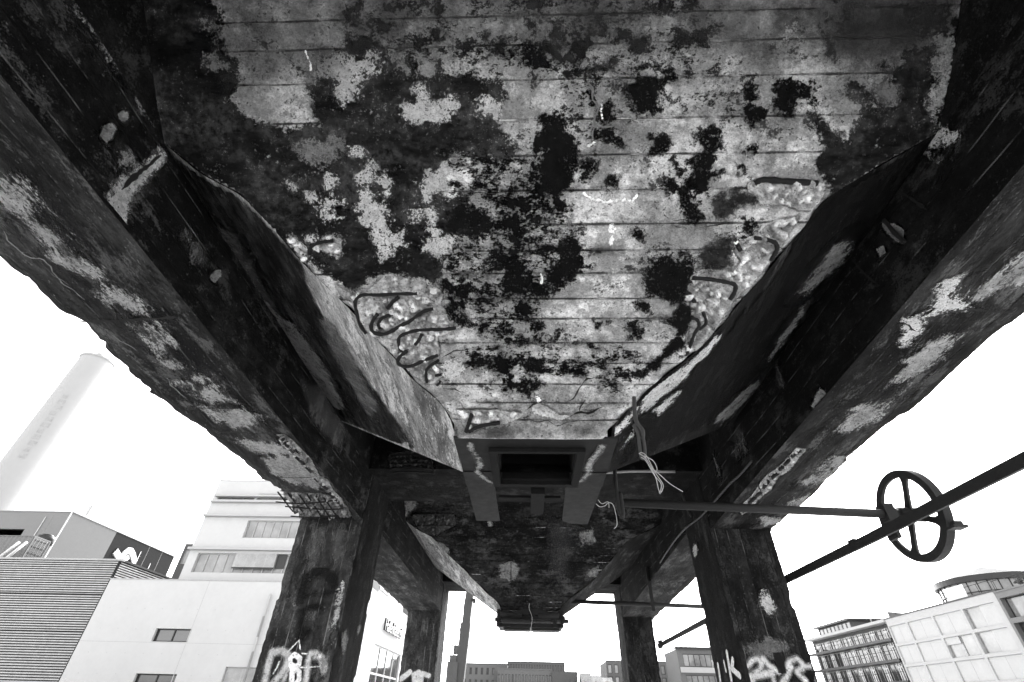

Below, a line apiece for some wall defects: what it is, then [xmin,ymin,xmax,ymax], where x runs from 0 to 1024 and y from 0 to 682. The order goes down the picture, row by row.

damp [107,148,167,223]
damp [582,192,639,204]
damp [965,251,1024,303]
damp [0,174,326,489]
damp [300,377,345,453]
damp [318,318,378,417]
damp [833,334,964,433]
spalling [275,434,353,520]
spalling [740,448,806,515]